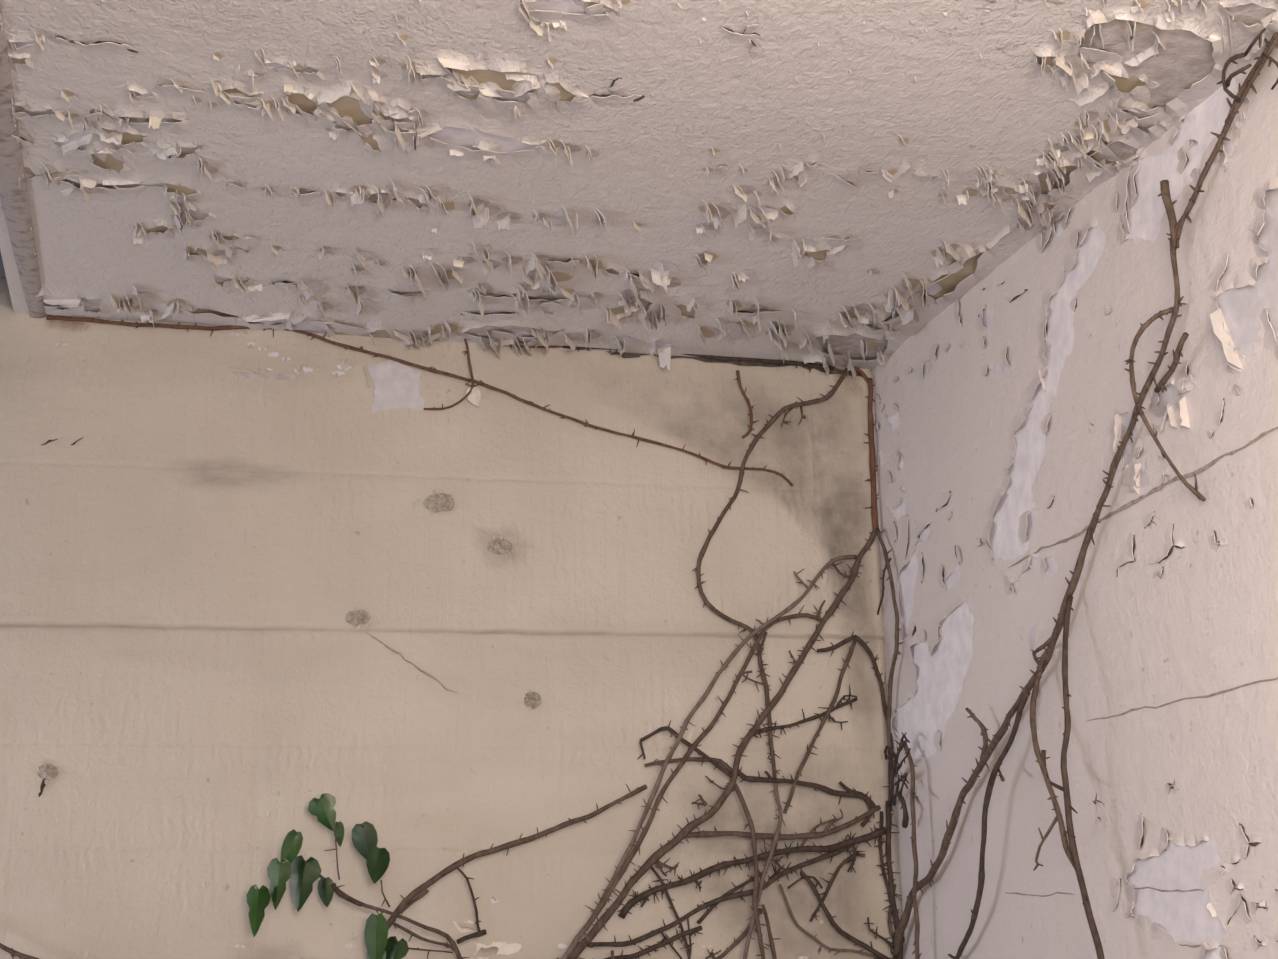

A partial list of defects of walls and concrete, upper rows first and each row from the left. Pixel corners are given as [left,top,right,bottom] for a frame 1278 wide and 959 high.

peeling [1,23,53,73]
peeling [11,0,1278,600]
crack [1008,385,1278,578]
spalling [345,607,372,630]
peeling [873,393,977,763]
spalling [522,689,541,712]
crack [1087,677,1278,721]
peeling [1117,813,1234,959]